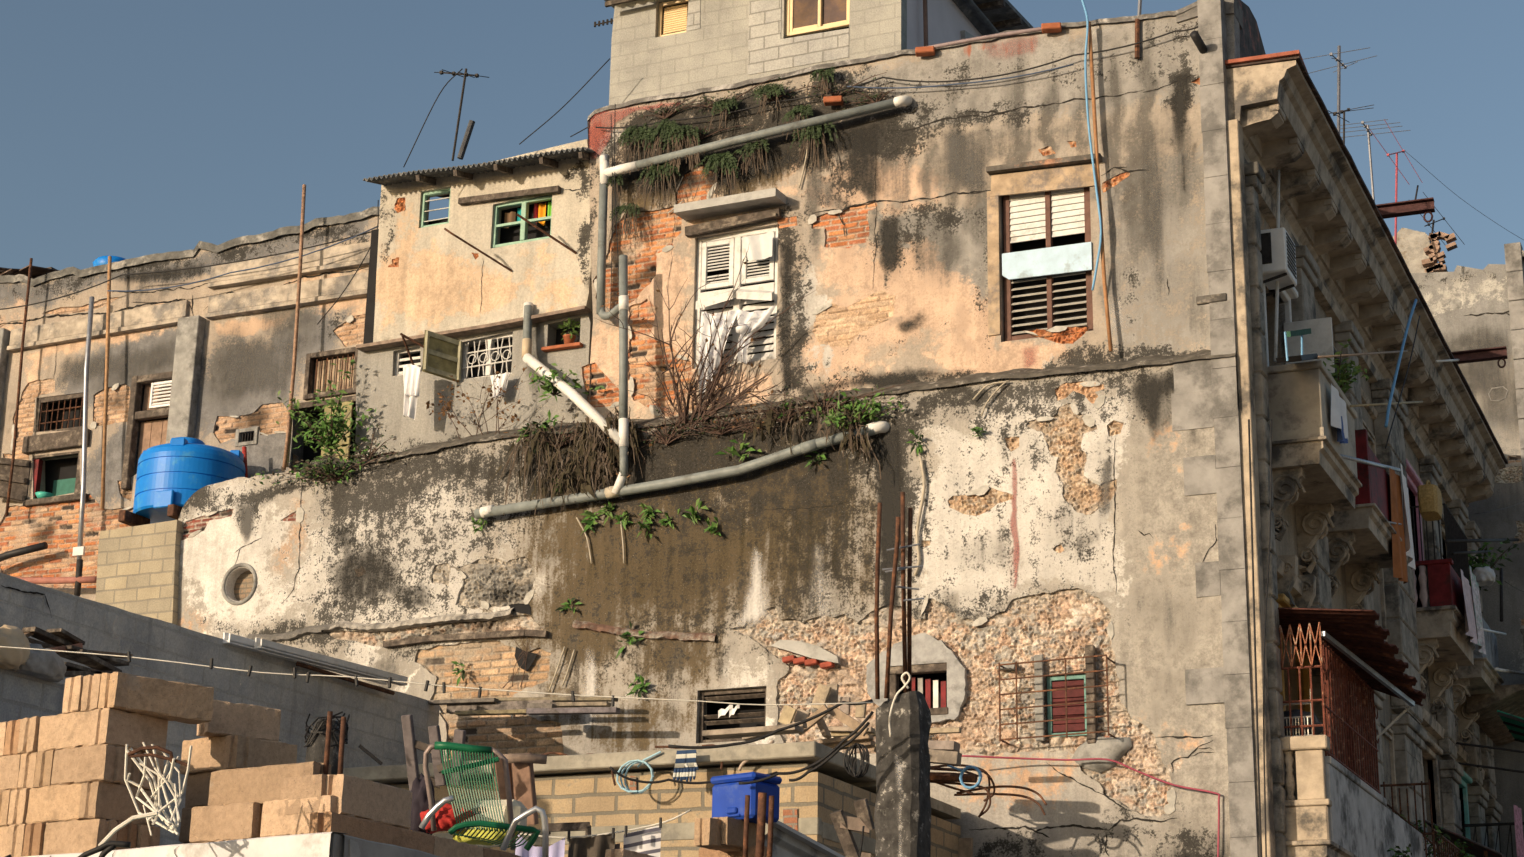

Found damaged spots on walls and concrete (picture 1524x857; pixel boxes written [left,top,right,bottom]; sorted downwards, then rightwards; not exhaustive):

water stain [1172,75,1188,140]
flaking render [777,202,877,248]
flaking render [582,166,717,417]
water stain [779,245,938,395]
flaking render [4,379,55,460]
flaking render [214,403,288,443]
flaking render [1005,381,1124,515]
flaking render [948,485,1014,516]
water stain [333,527,428,606]
water stain [743,556,764,622]
flaking render [732,589,1176,817]
crack [972,763,1176,856]